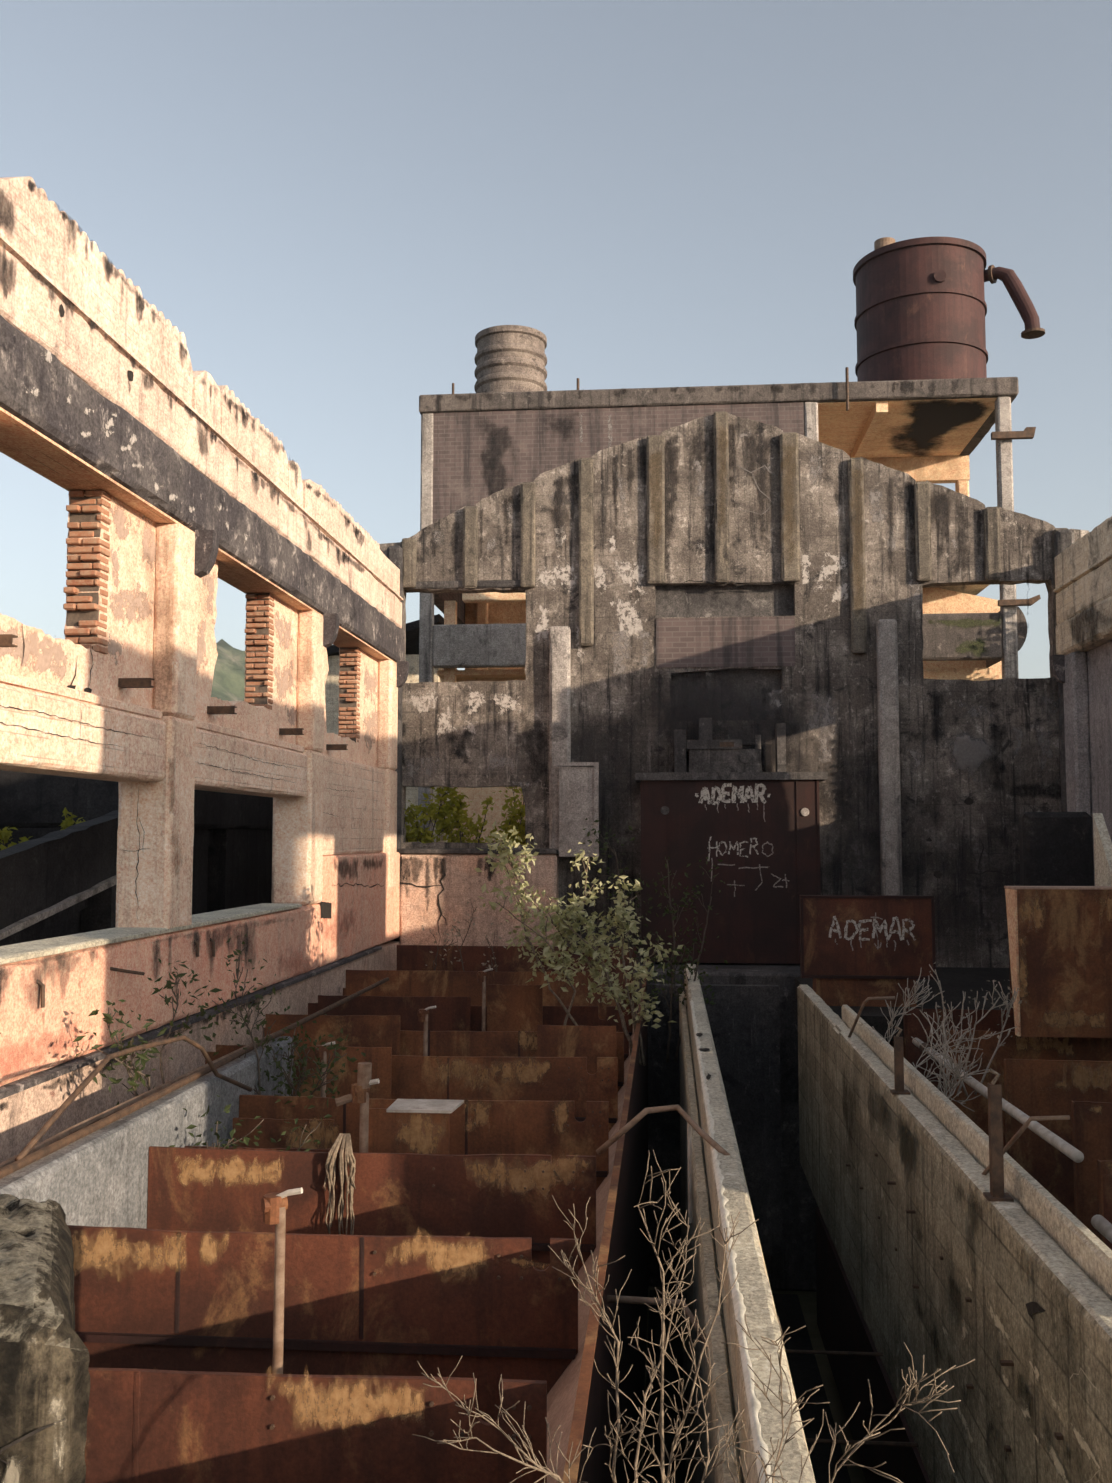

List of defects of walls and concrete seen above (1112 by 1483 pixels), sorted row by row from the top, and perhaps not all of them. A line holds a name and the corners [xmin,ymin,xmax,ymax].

damp [479,425,521,560]
damp [535,414,770,678]
damp [801,552,850,603]
damp [870,478,982,590]
damp [1007,512,1043,606]
damp [808,691,837,762]
crack [124,789,144,919]
corrosion [1018,892,1045,998]
corrosion [72,1229,229,1280]
corrosion [389,1234,487,1279]
corrosion [273,1376,423,1429]